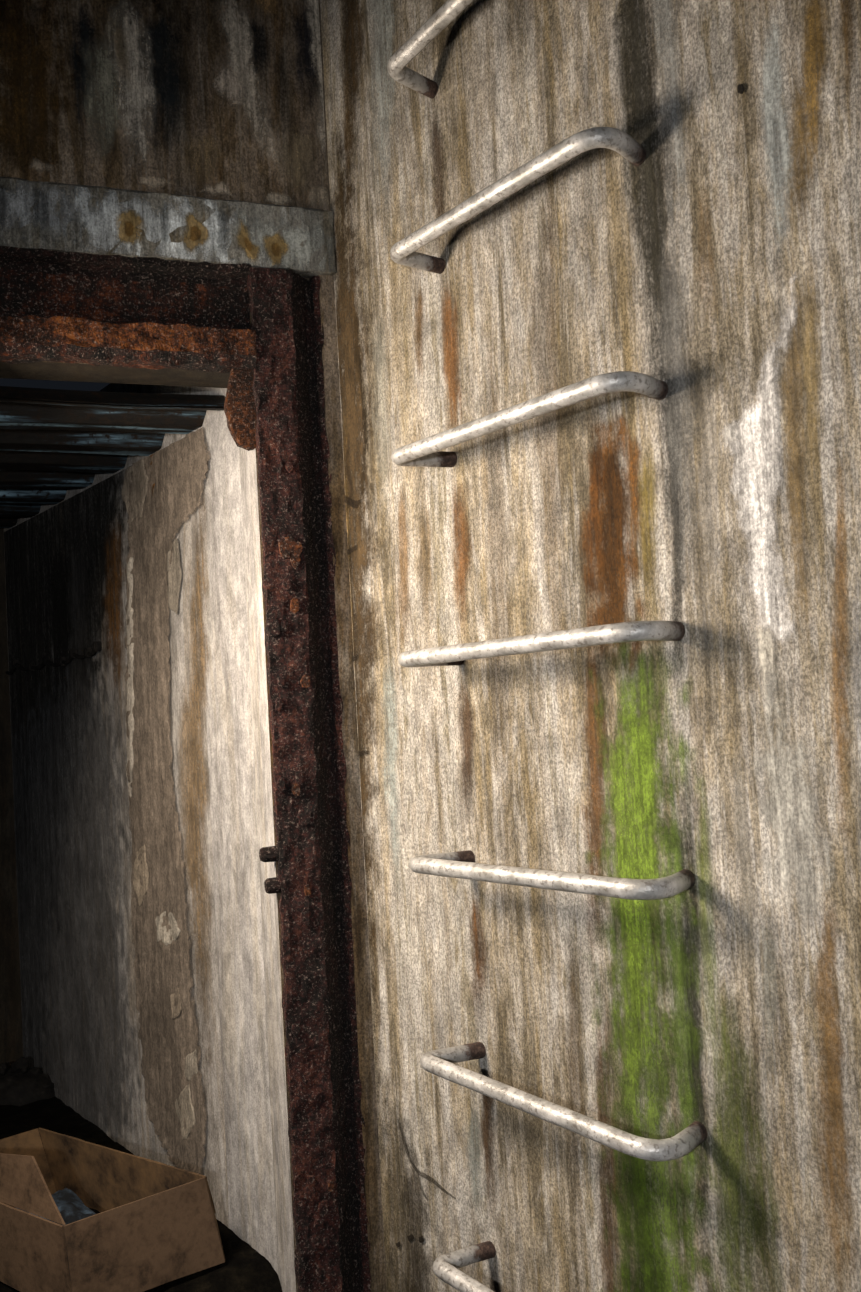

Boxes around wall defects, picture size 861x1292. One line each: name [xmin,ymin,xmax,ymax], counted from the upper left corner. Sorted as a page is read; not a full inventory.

rust [182,213,209,251]
rust [237,222,288,264]
leakage [615,0,693,621]
rust [105,533,124,680]
rust [266,536,303,637]
rust [582,417,653,627]
leakage [723,300,830,911]
rust [179,509,210,1007]
rust [586,641,638,876]
leakage [597,643,774,1292]
rust [596,1029,612,1125]
rust [600,1145,618,1292]